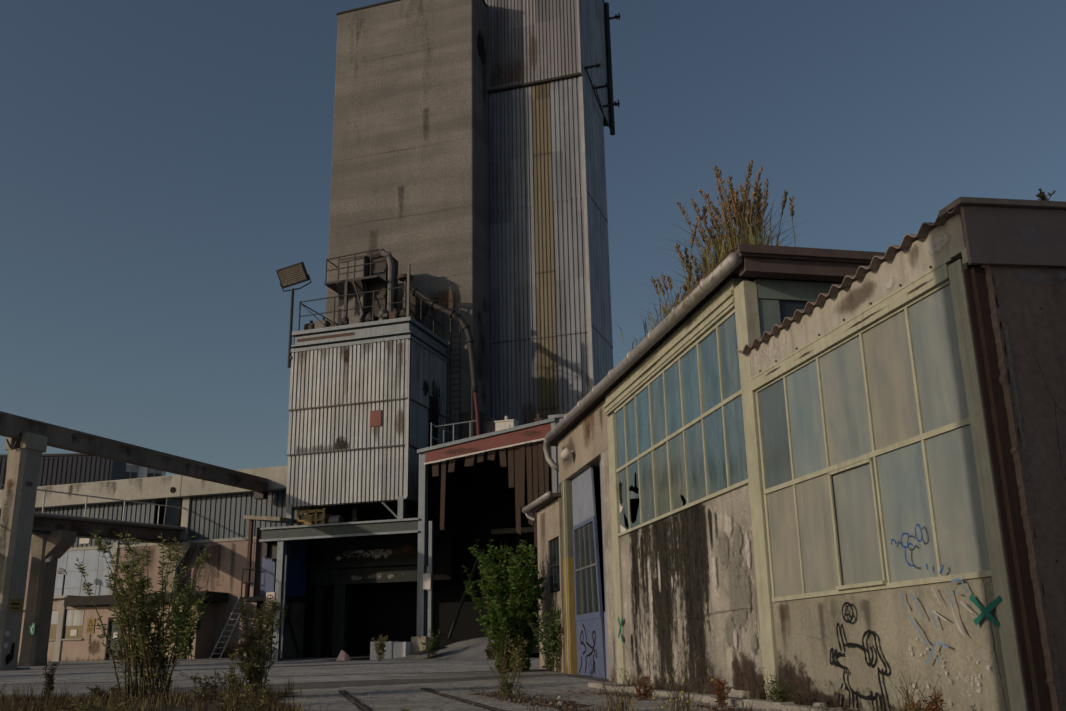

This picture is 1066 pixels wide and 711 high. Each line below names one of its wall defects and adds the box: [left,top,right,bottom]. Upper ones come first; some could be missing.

damp [629,504,765,699]
peeling [711,512,757,655]
damp [777,656,907,711]